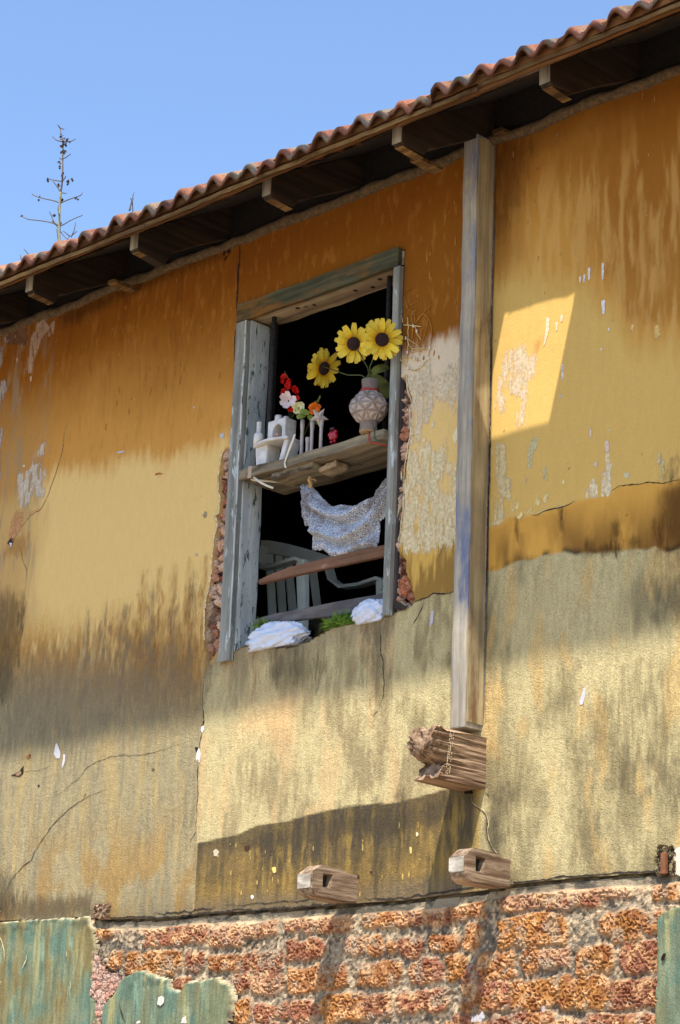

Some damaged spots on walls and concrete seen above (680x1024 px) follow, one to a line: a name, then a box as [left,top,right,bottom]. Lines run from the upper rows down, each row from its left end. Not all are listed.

peeling [0,335,16,401]
peeling [16,319,55,381]
peeling [495,315,563,426]
peeling [9,443,46,547]
flaking render [203,425,229,659]
peeling [393,358,459,611]
peeling [490,437,548,525]
crack [532,501,574,517]
crack [611,476,676,491]
crack [1,672,205,906]
flaking render [90,953,125,1024]